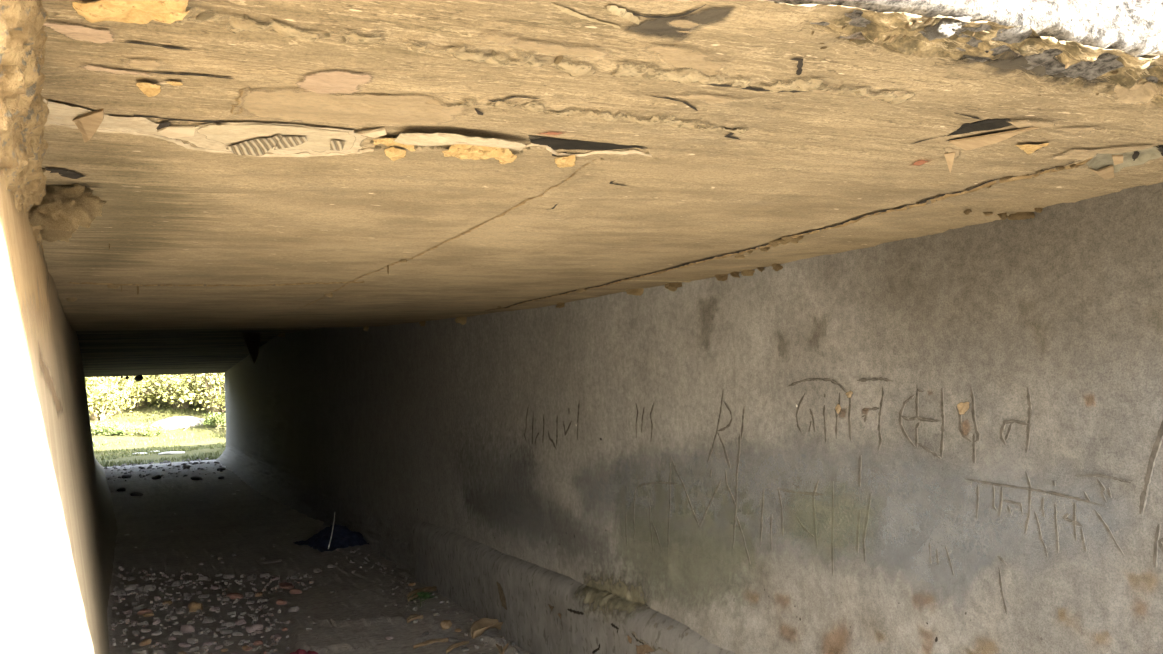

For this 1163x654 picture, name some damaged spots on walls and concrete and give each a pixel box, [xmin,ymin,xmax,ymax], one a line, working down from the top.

spalling [612,46,915,105]
peeling [1111,71,1163,104]
peeling [0,0,746,258]
peeling [1016,143,1049,155]
spalling [1053,146,1163,179]
crack [485,157,1093,311]